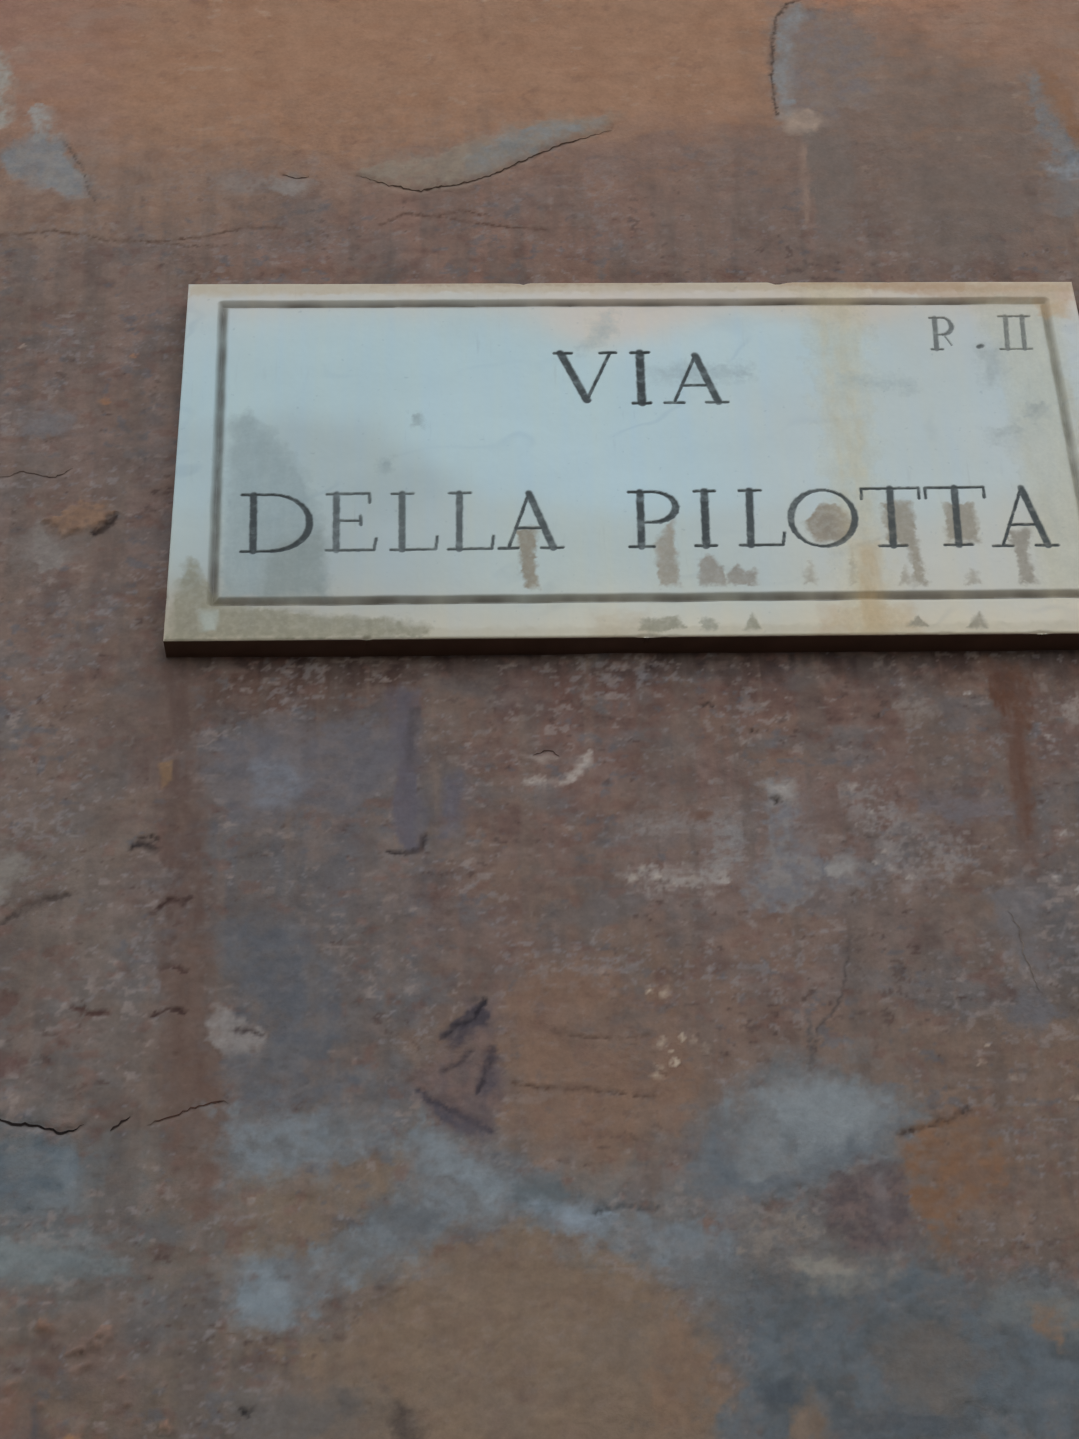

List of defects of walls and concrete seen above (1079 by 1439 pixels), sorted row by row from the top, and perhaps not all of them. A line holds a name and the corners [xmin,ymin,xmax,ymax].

flaking render [0,43,101,203]
damp [783,116,1047,282]
spalling [0,496,122,582]
crack [0,1101,227,1135]